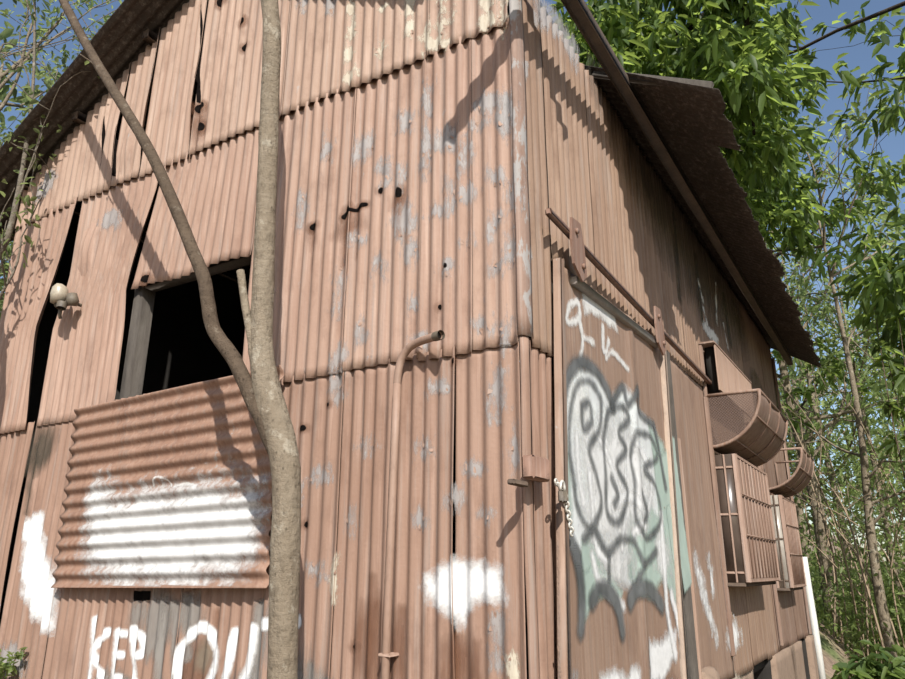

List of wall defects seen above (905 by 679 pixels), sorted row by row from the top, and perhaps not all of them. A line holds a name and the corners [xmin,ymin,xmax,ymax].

peeling [342,0,360,85]
peeling [400,0,457,57]
peeling [478,0,509,40]
leakage [26,431,53,512]